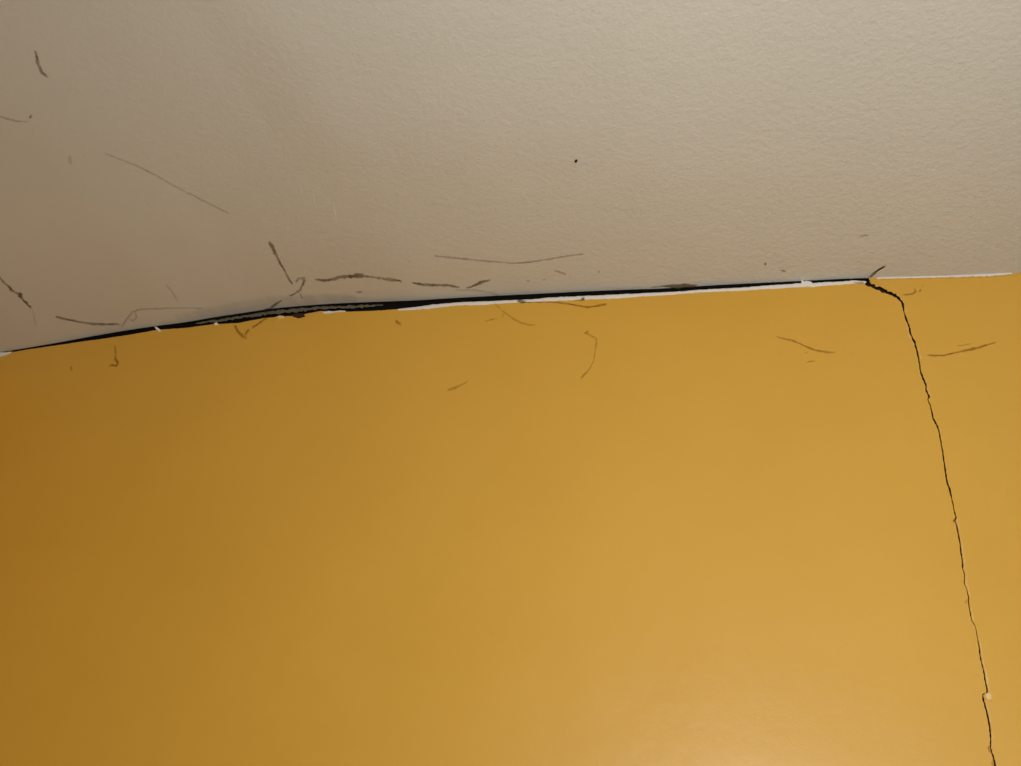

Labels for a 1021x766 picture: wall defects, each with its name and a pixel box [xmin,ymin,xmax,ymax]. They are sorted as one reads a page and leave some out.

crack [235,243,364,336]
crack [394,279,487,288]
crack [866,266,990,493]
crack [953,517,998,766]